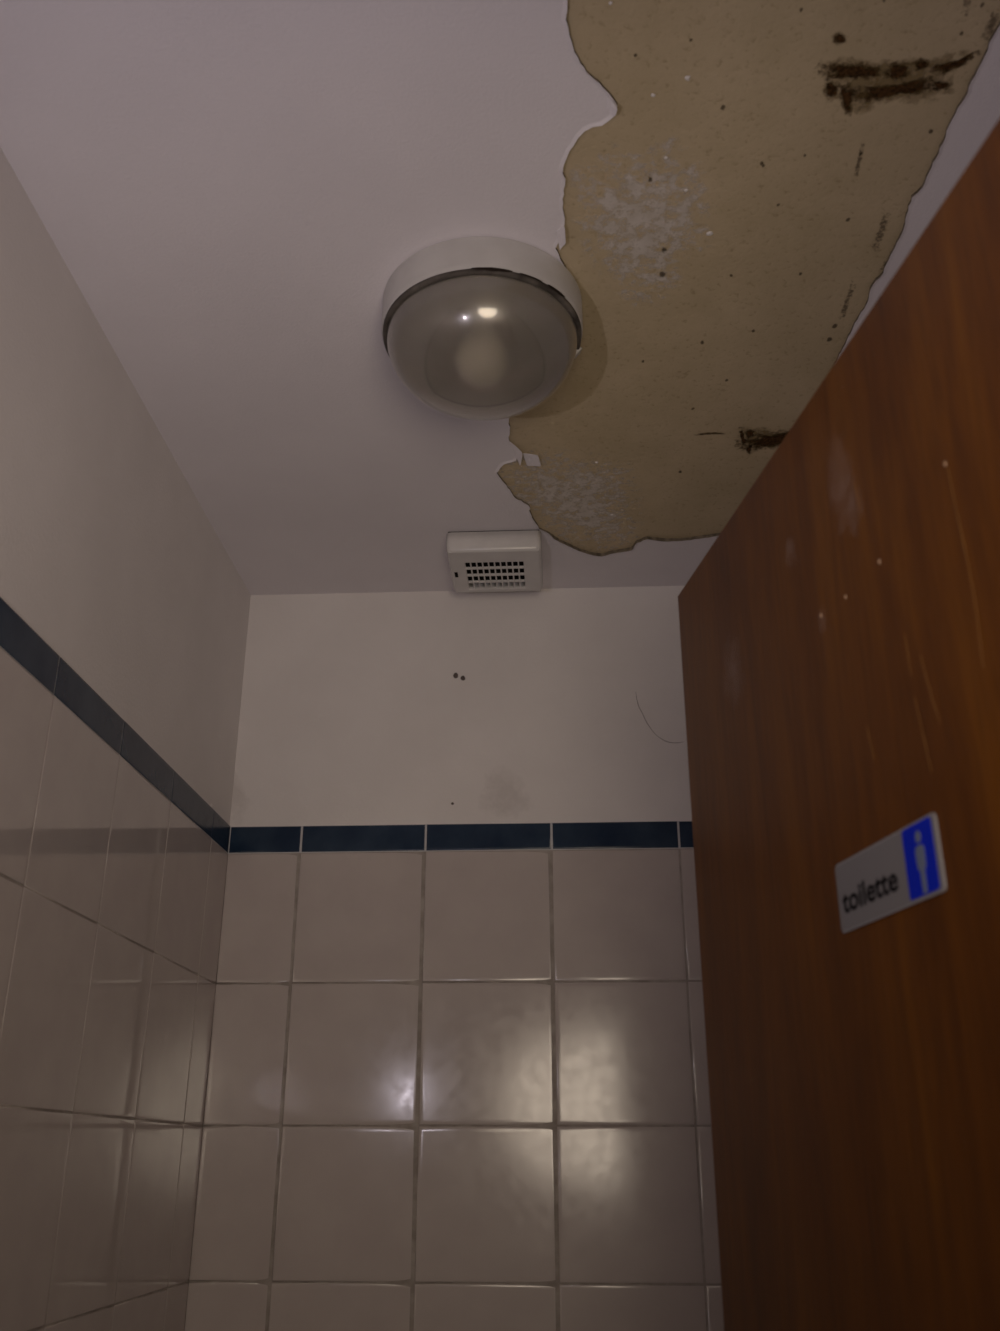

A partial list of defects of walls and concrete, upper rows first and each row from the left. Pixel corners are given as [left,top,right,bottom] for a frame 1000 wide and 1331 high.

peeling [494,0,1000,556]